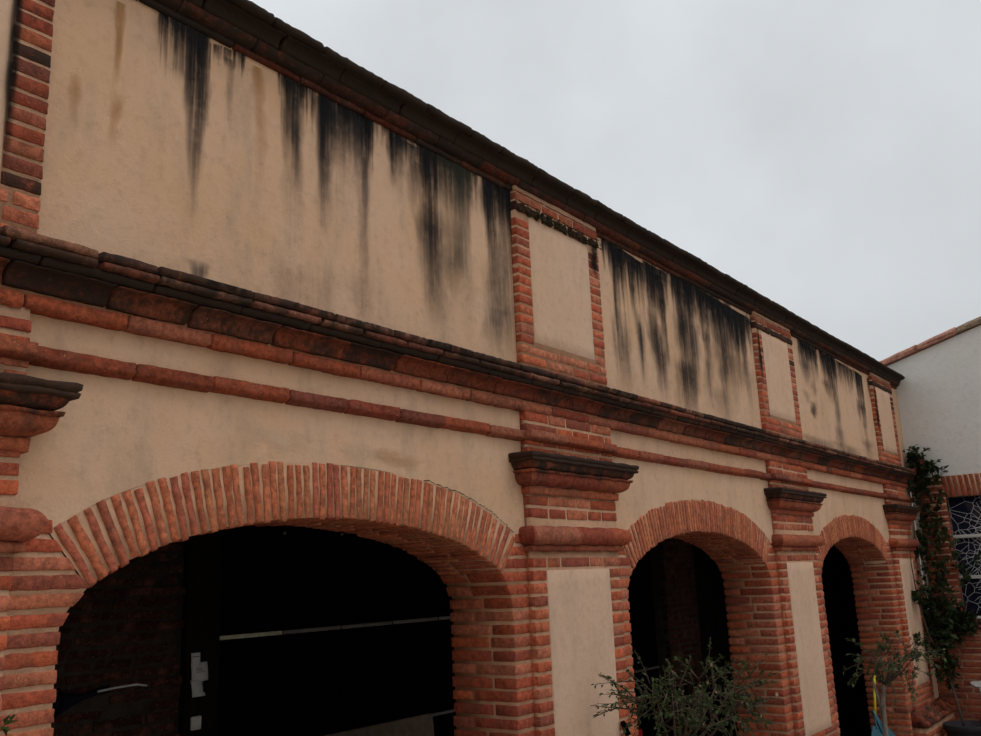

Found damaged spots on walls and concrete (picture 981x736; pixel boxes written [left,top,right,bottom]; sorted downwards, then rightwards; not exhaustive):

damp [159,12,245,117]
damp [278,72,511,224]
damp [592,238,762,362]
damp [797,339,878,415]